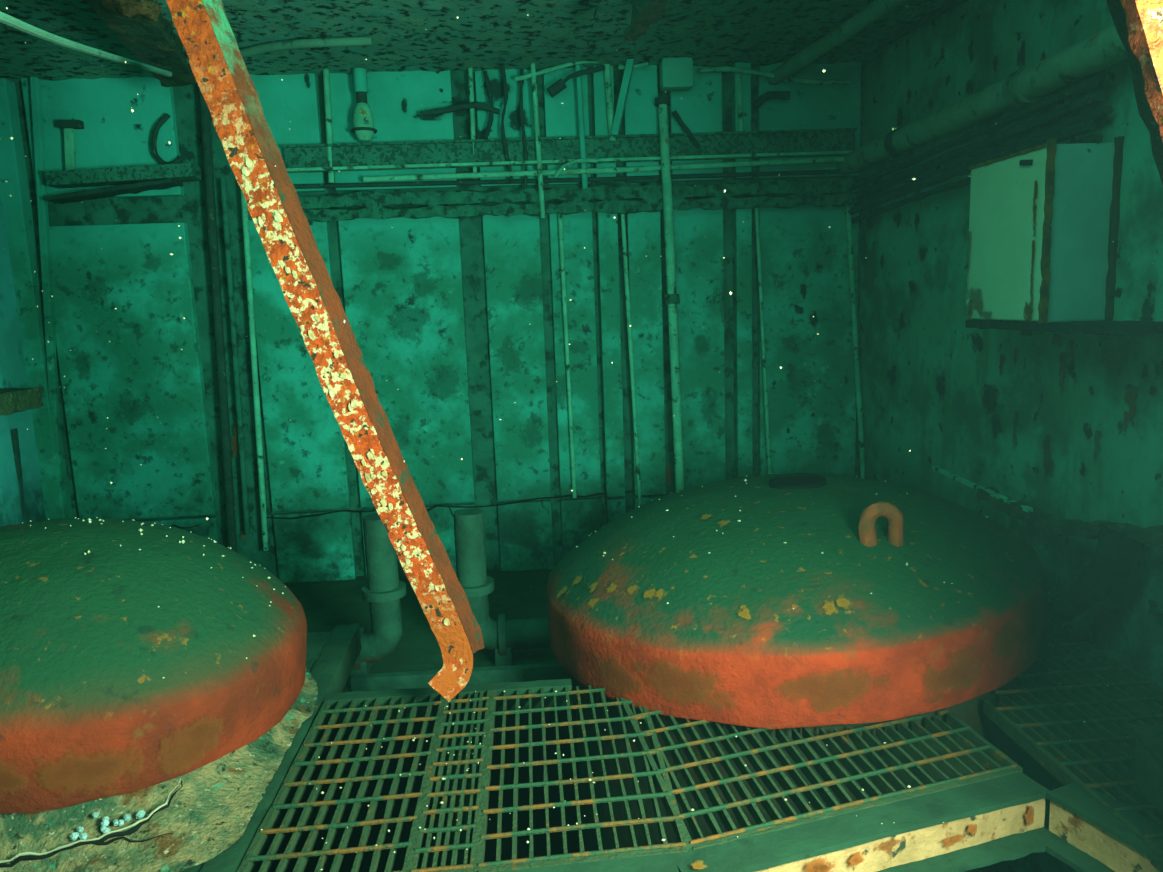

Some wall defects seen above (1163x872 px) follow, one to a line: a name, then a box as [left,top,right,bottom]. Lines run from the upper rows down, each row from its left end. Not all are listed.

corrosion [941,824,977,847]
corrosion [806,858,836,872]
corrosion [849,852,865,868]